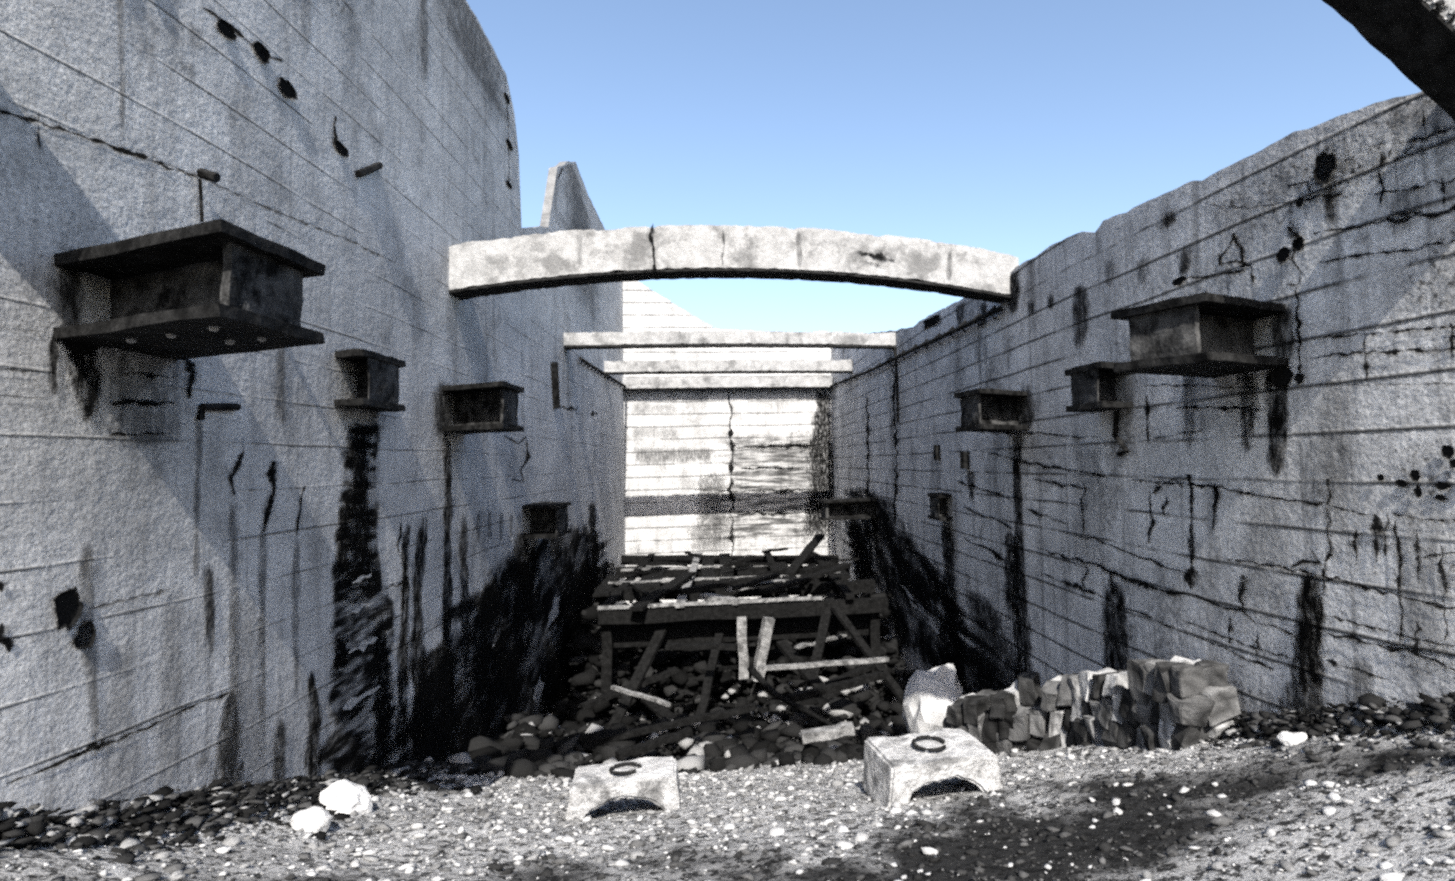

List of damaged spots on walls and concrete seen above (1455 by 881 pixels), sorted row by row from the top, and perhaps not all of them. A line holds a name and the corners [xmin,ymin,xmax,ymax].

damp [360,525,615,770]
damp [637,450,707,461]
damp [697,390,1018,693]